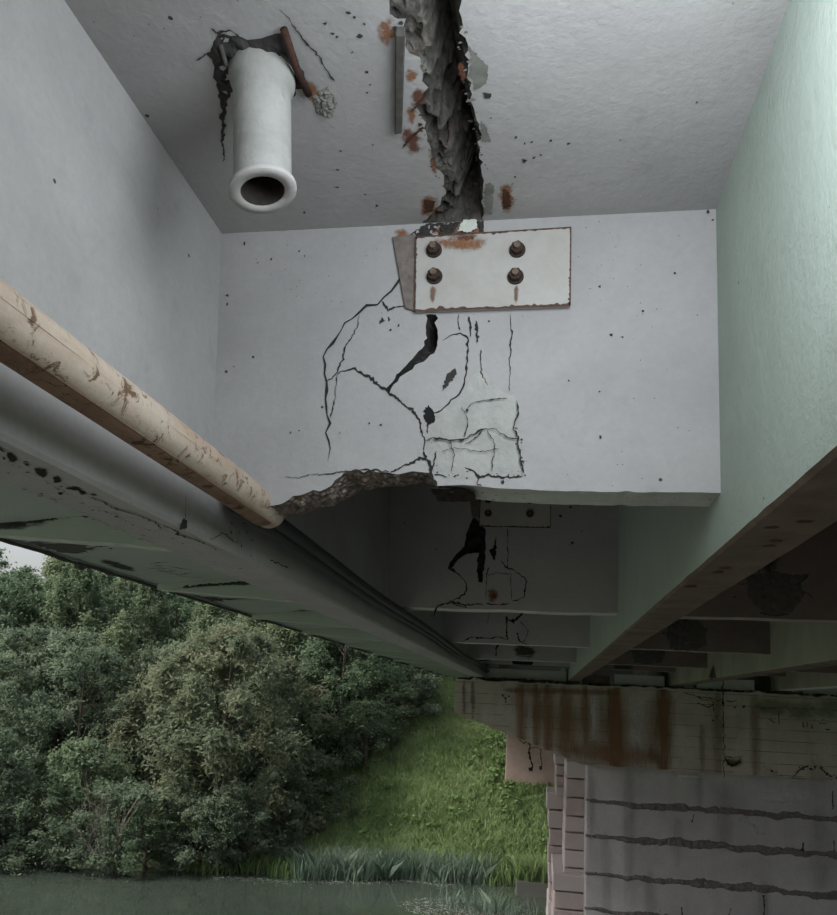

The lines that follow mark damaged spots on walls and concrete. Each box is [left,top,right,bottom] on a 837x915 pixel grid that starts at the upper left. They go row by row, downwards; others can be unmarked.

spalling [196,28,304,161]
corrosion [402,89,436,173]
spalling [389,0,495,236]
crack [285,279,522,485]
spalling [271,470,496,515]
crack [433,517,535,661]
crack [519,739,542,771]
corrosion [509,686,671,769]
crack [686,681,746,775]